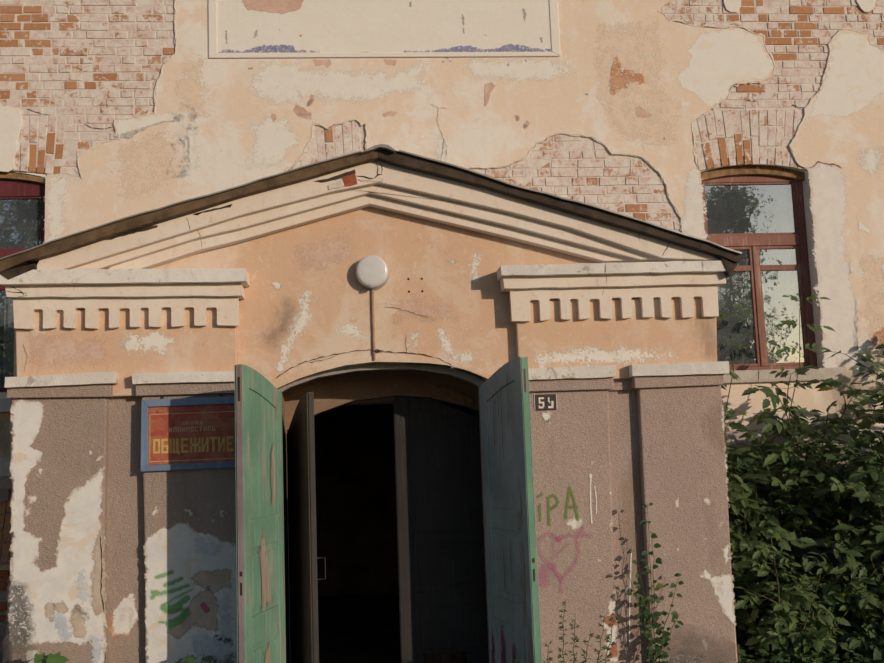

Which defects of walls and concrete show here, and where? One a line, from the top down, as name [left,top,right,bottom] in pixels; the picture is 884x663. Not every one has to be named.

spalling [0,0,201,243]
peeling [245,58,427,172]
spalling [462,0,884,389]
peeling [111,330,179,358]
peeling [275,290,317,381]
peeling [0,399,237,663]
spalling [602,591,619,663]
peeling [699,543,736,626]